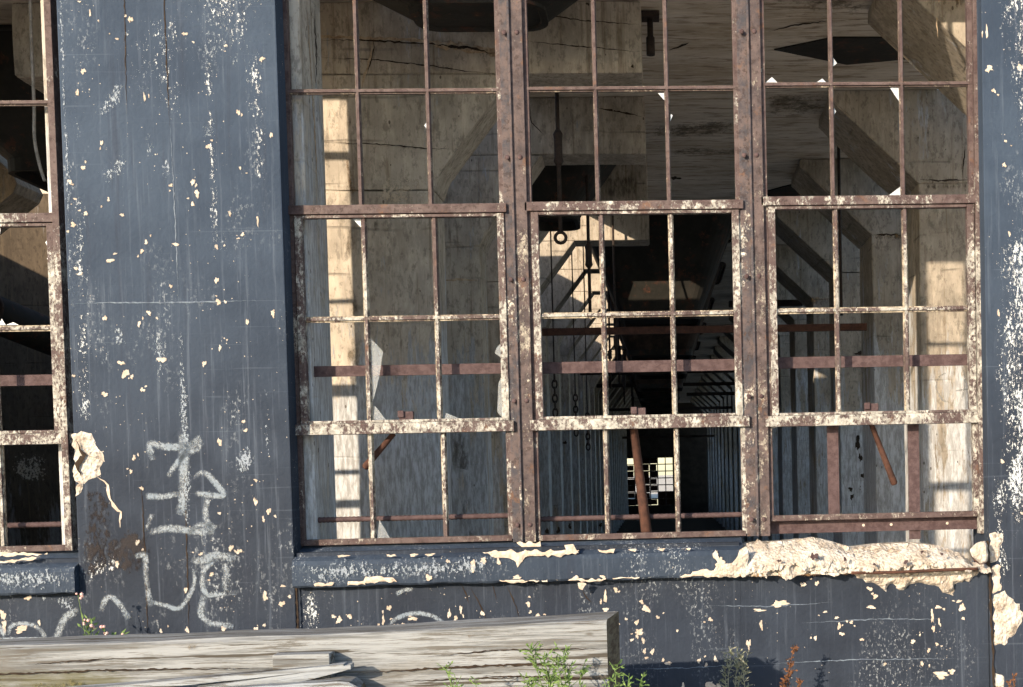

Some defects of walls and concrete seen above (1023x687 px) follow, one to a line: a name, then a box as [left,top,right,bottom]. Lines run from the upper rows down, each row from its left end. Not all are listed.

peeling [0,552,47,563]
peeling [471,523,579,583]
peeling [348,576,397,585]
peeling [569,575,639,612]
spalling [681,532,1023,680]
spalling [995,673,1004,687]